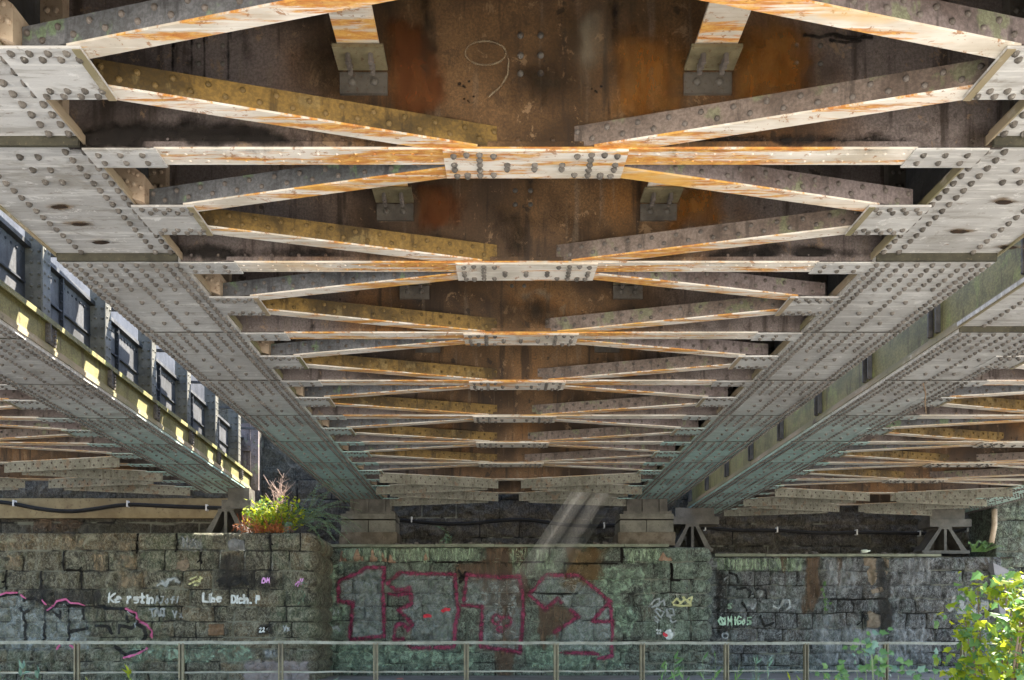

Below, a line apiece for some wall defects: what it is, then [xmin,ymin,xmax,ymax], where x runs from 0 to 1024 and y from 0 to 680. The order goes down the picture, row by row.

rust [389,20,443,113]
rust [618,41,679,115]